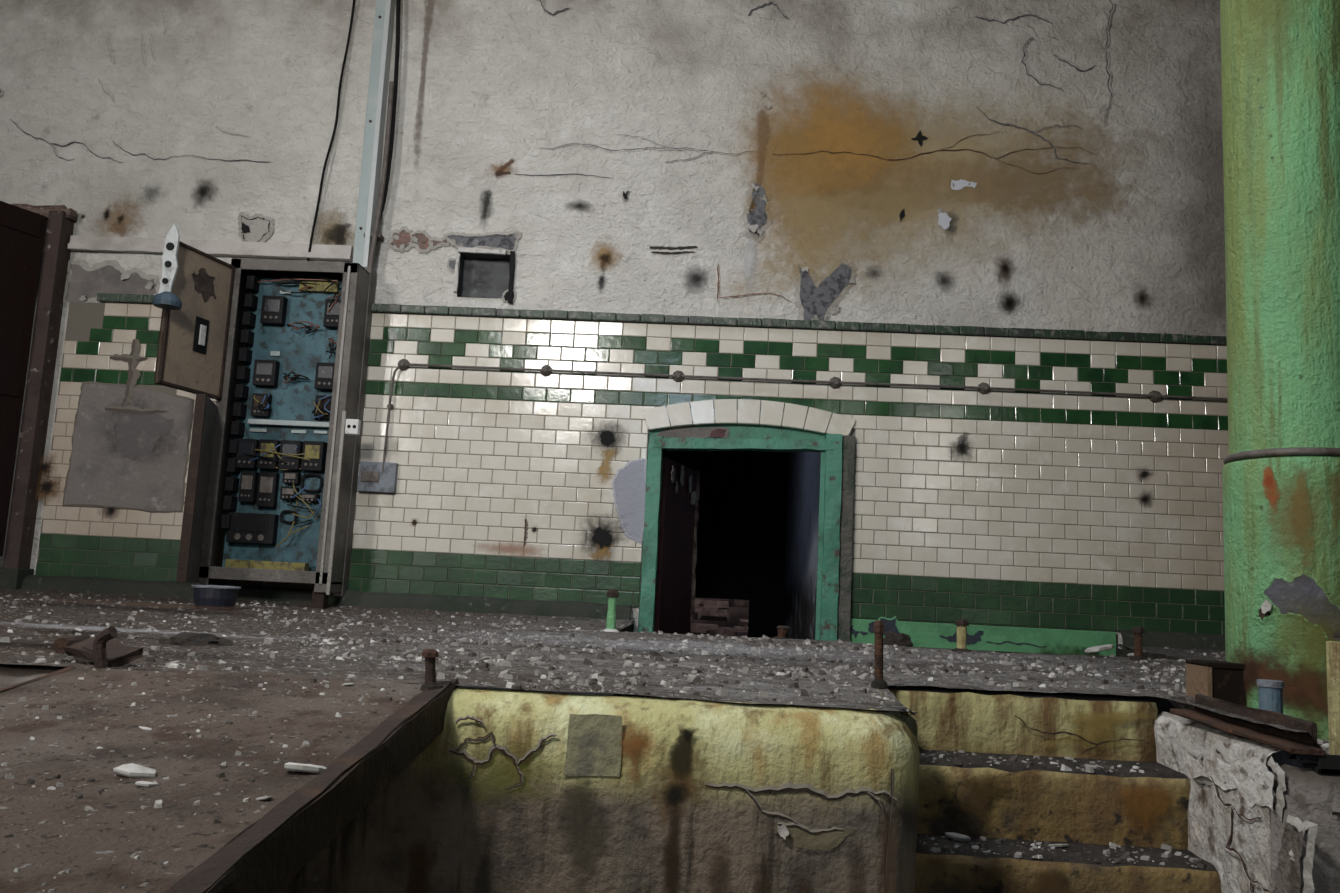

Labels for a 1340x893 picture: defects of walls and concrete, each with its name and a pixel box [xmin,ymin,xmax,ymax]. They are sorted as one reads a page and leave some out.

crack [10,119,269,163]
crack [513,106,1094,178]
peeling [63,260,160,308]
corrosion [1263,467,1311,549]
peeling [850,616,899,638]
peeling [940,631,984,645]
peeling [1252,570,1340,642]
crack [449,715,558,790]
spalling [1179,738,1340,893]
crack [1332,807,1340,816]